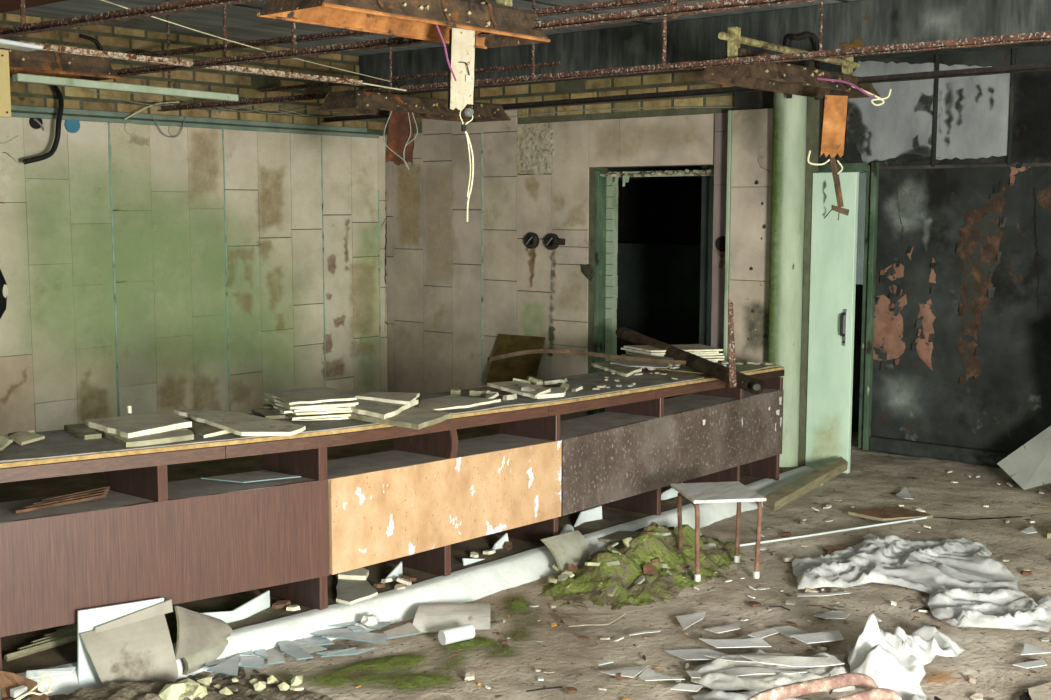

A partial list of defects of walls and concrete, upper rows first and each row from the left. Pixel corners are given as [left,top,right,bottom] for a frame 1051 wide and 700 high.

damp [845,103,932,166]
damp [946,89,963,143]
peeling [846,61,1034,385]